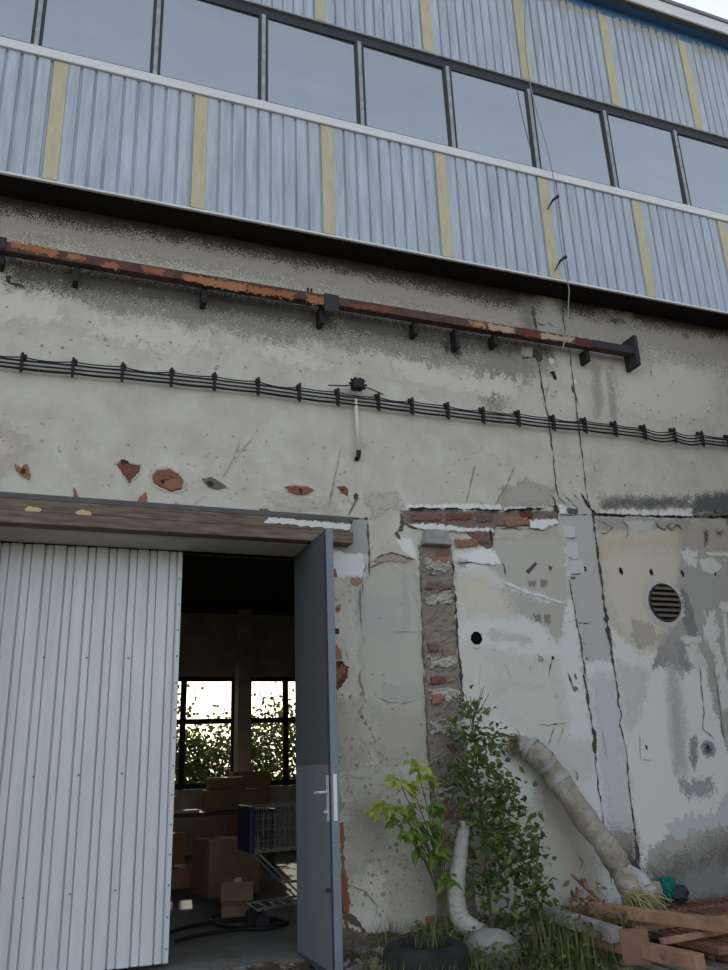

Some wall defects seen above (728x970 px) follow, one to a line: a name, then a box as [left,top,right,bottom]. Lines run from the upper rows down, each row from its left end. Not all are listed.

corrosion [8,239,87,262]
corrosion [140,265,166,276]
corrosion [182,274,324,307]
corrosion [468,320,593,348]
spalling [13,460,33,483]
spalling [113,459,229,502]
spalling [283,483,316,497]
crack [329,299,646,883]
spalling [335,628,349,690]
flaking render [372,502,578,930]